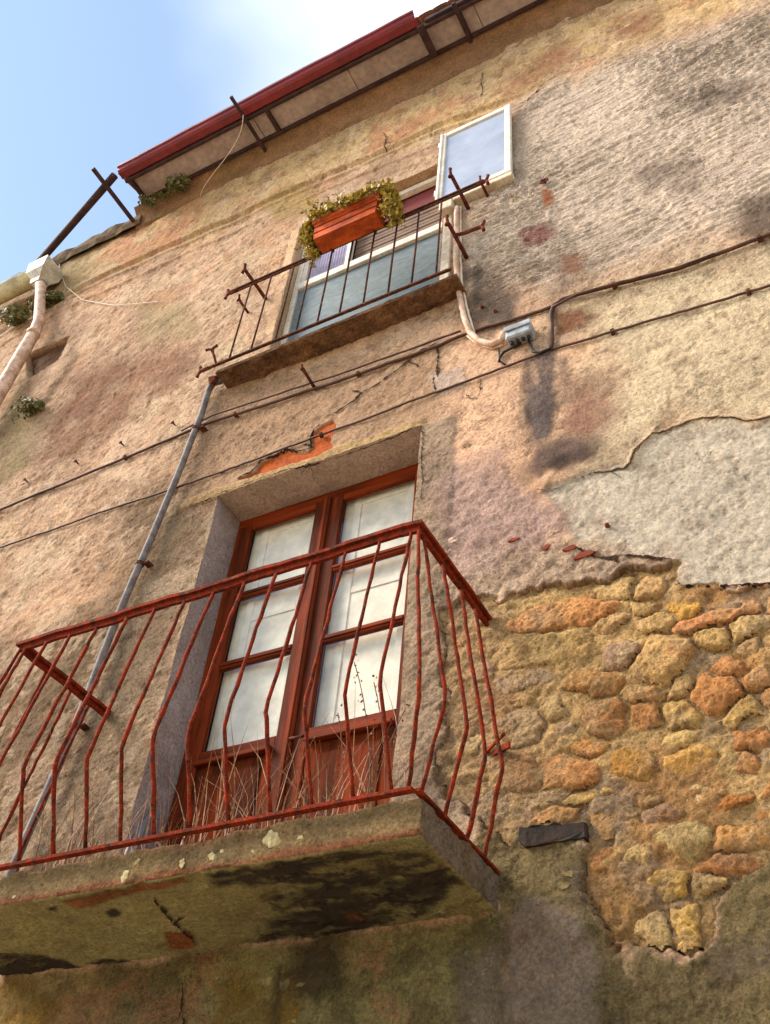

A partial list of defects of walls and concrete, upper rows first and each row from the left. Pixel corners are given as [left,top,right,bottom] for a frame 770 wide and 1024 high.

spalling [249,423,336,478]
crack [194,343,439,506]
leakage [520,351,613,474]
crack [537,414,770,491]
spalling [436,563,770,957]
leakage [0,953,78,975]
crack [153,897,195,943]
leakage [208,849,460,1022]